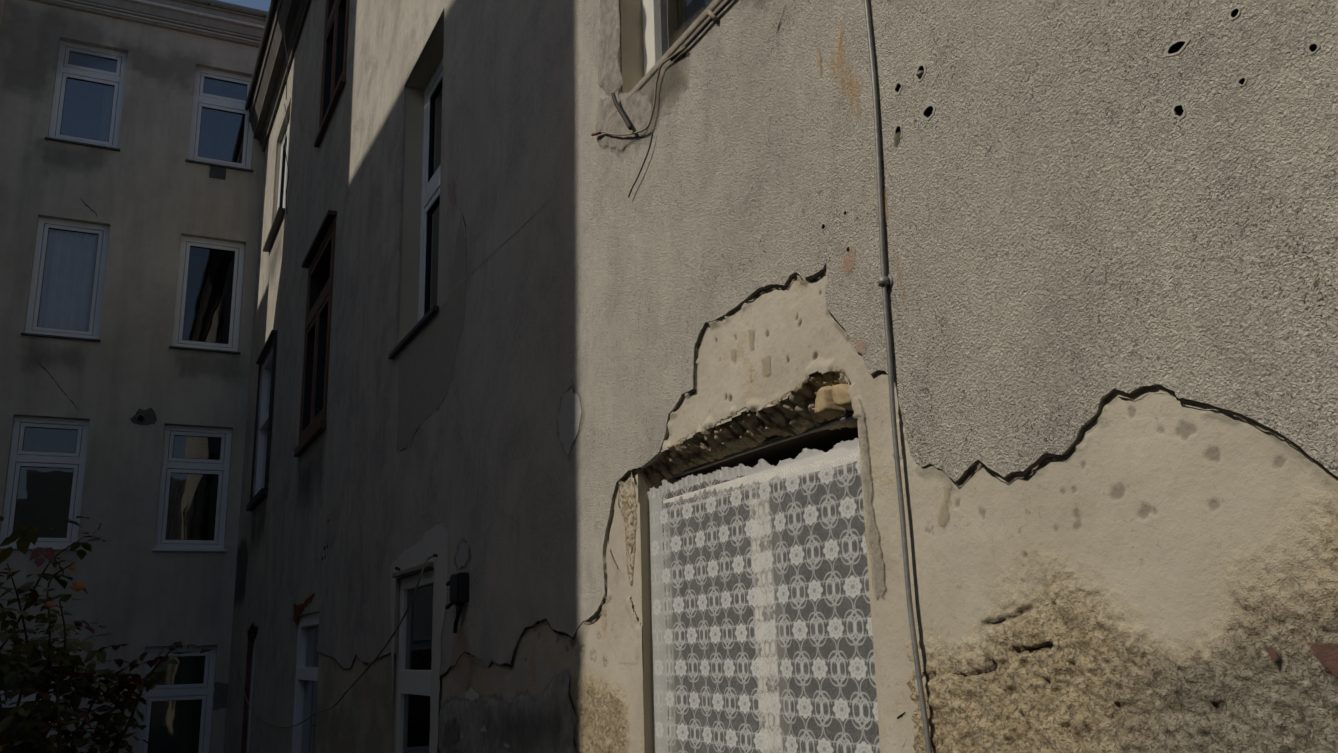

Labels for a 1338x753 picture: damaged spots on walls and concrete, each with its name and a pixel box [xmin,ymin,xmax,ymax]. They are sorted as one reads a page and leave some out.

spalling [439,269,1338,753]